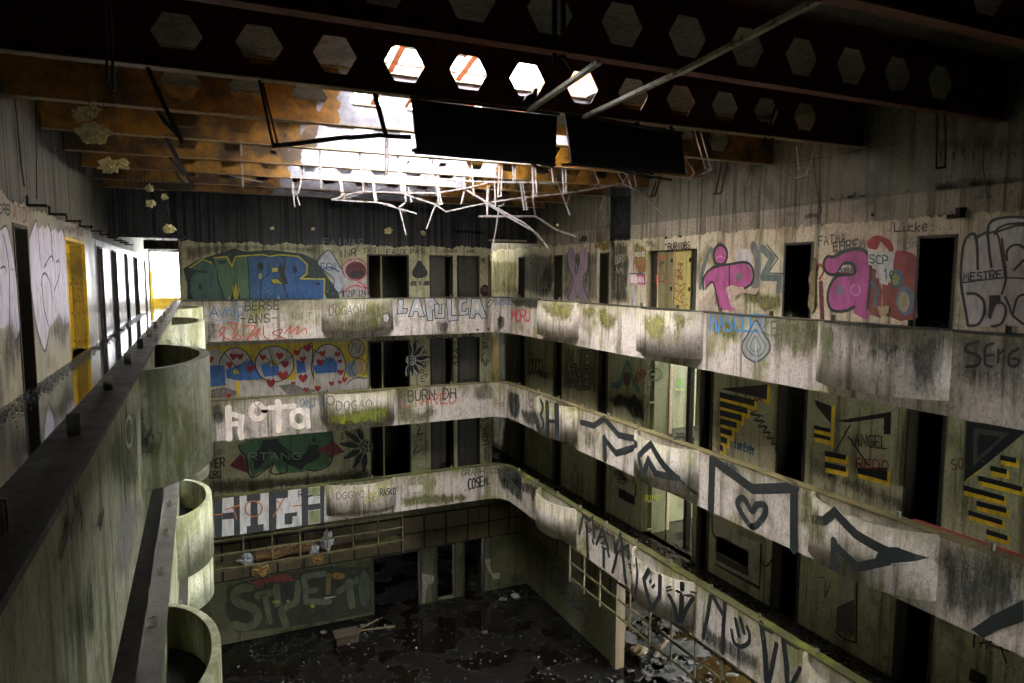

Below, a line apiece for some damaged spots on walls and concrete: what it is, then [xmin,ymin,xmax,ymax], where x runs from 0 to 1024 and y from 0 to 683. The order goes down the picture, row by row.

water stain [846,327,936,387]
water stain [938,549,1022,618]